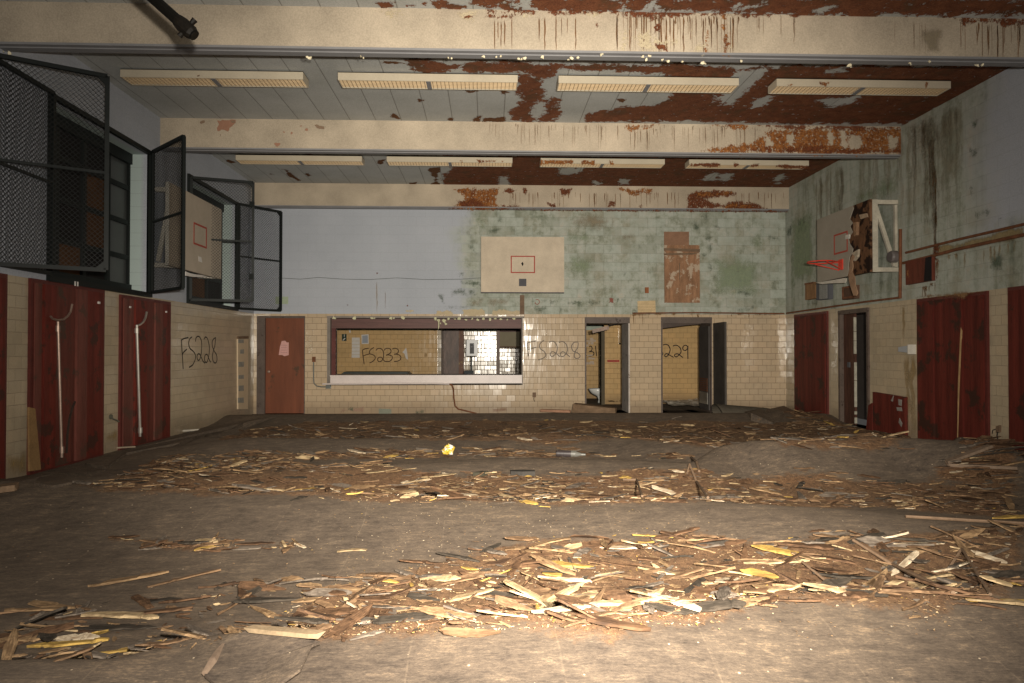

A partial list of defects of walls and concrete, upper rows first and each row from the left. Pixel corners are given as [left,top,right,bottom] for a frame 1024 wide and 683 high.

peeling [374,0,1024,20]
rust [485,9,775,53]
rust [953,17,1024,57]
peeling [383,53,1010,125]
rust [617,124,901,169]
peeling [428,155,840,187]
rust [452,187,788,213]